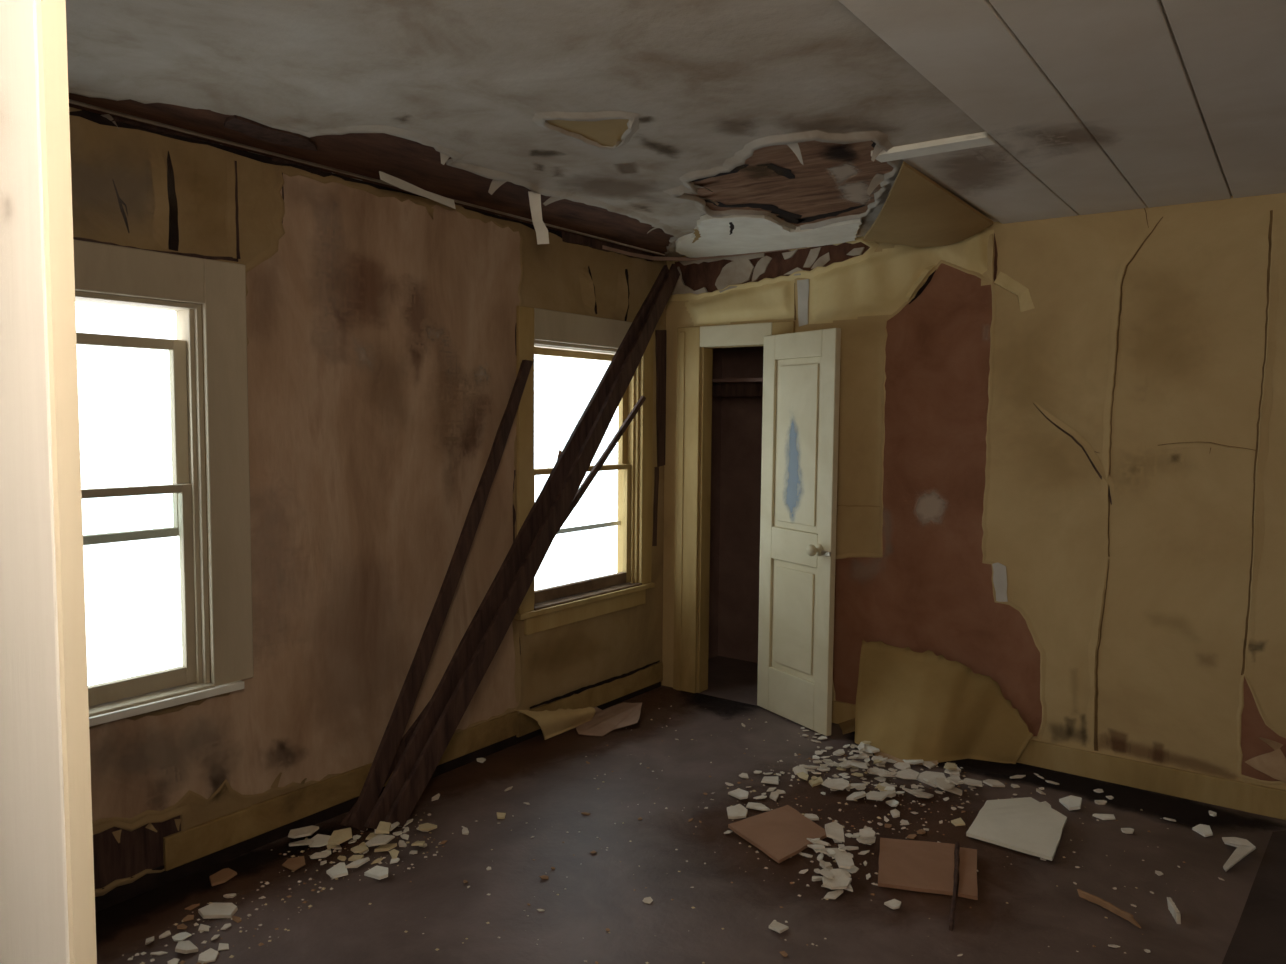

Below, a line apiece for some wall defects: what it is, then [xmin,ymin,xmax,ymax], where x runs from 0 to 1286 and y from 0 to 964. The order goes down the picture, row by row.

crack [112,147,179,251]
flaking render [68,87,903,301]
water stain [825,145,868,204]
crack [1033,398,1119,505]
spalling [93,804,193,897]